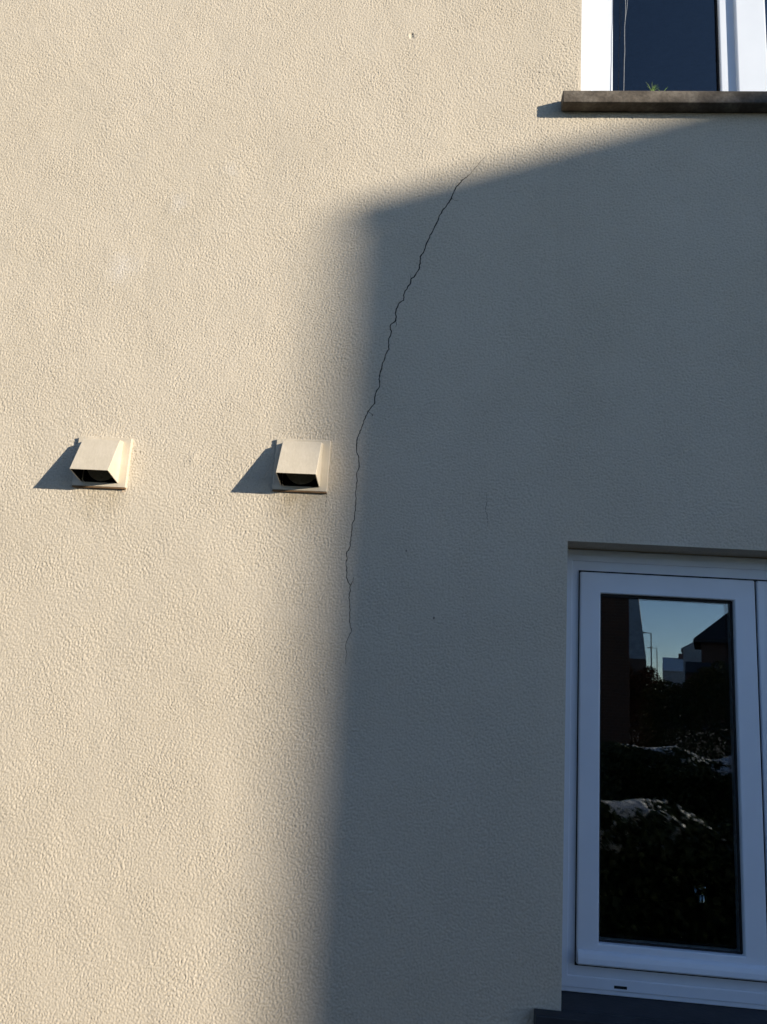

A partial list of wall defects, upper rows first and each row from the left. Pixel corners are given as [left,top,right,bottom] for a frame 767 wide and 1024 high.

crack [345,157,485,664]